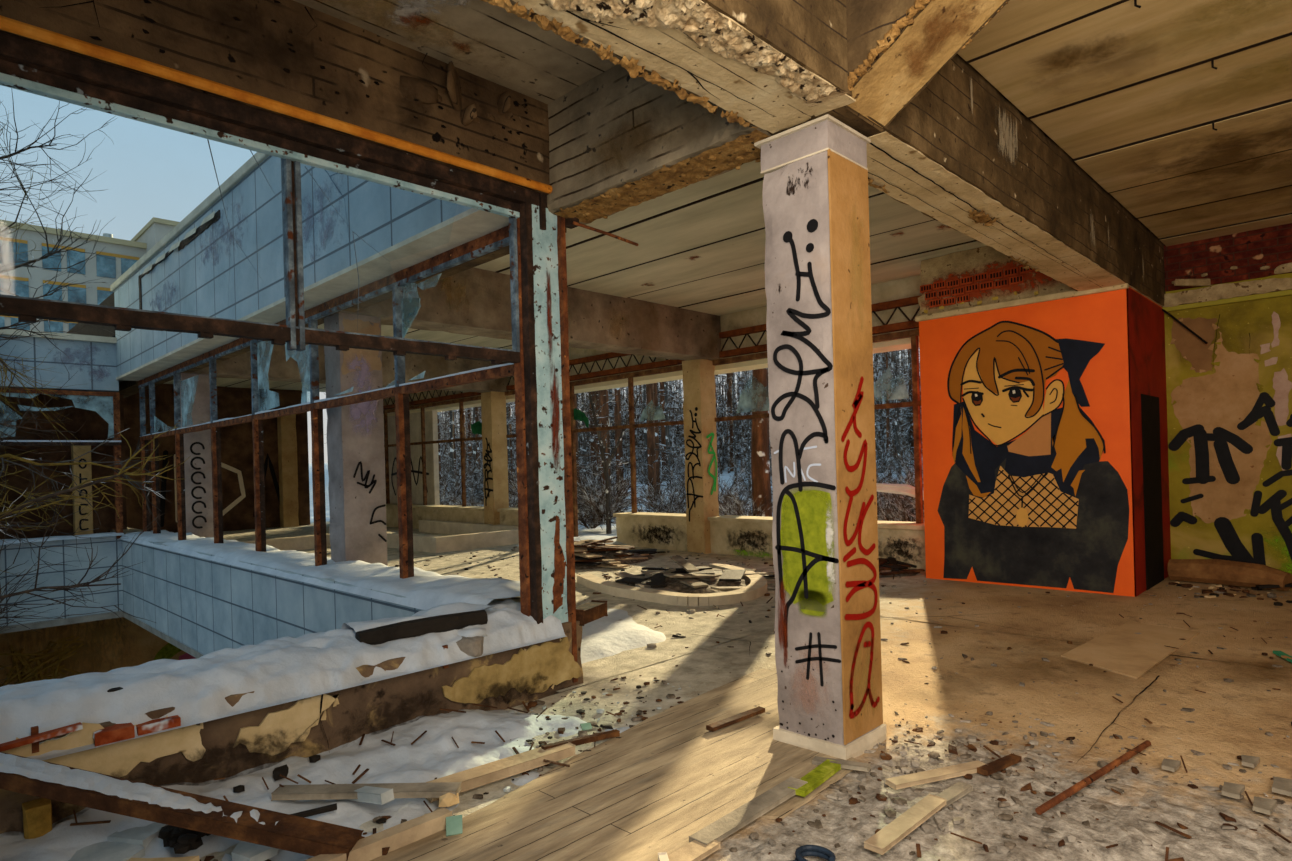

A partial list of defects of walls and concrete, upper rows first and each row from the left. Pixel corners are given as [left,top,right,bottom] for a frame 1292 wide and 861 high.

spalling [480,0,935,224]
spalling [918,256,1040,315]
spalling [1172,273,1212,286]
spalling [1260,262,1292,274]
rust [547,272,560,468]
peeling [1170,312,1292,523]
peeling [2,716,206,778]
peeling [233,694,340,756]